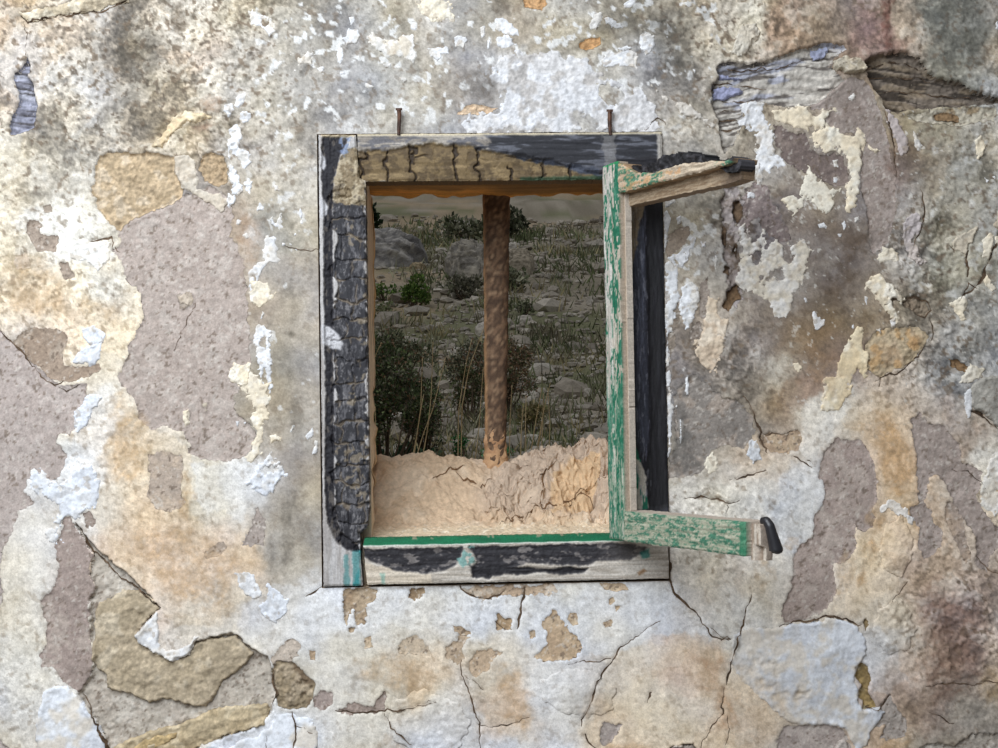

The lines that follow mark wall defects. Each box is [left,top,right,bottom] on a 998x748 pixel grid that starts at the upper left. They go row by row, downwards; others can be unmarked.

flaking render [9,58,38,135]
peeling [26,92,303,513]
peeling [457,12,998,479]
crack [84,694,110,748]
crack [75,522,161,608]
flaking render [0,325,387,748]
crack [335,700,436,745]
crack [460,585,525,629]
peeling [529,609,582,662]
crack [568,621,660,748]
crack [669,562,752,746]
peeling [781,412,998,623]